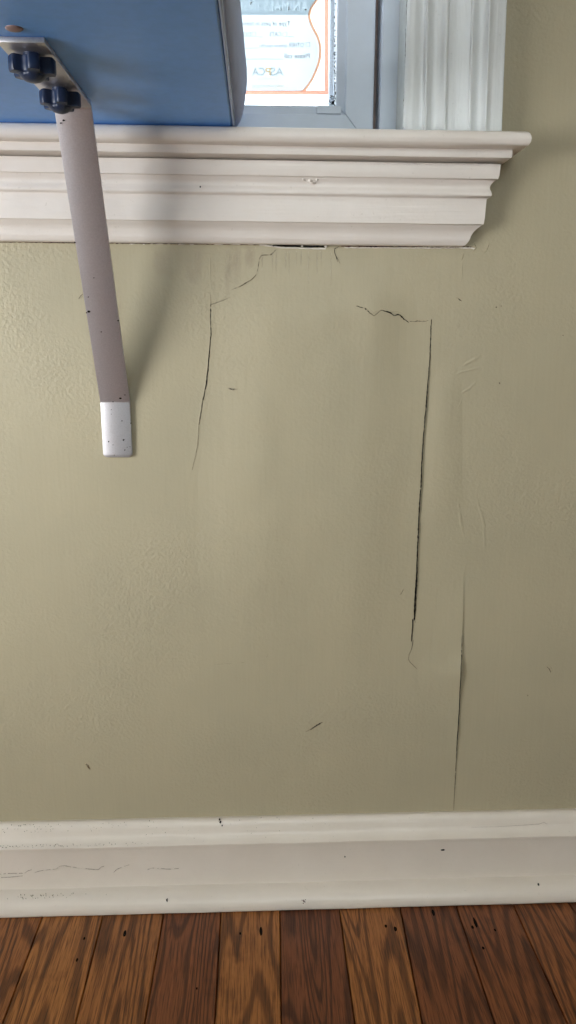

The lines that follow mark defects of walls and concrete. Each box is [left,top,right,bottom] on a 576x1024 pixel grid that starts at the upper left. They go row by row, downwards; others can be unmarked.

crack [191,251,276,470]
crack [356,305,432,669]
crack [454,650,462,810]